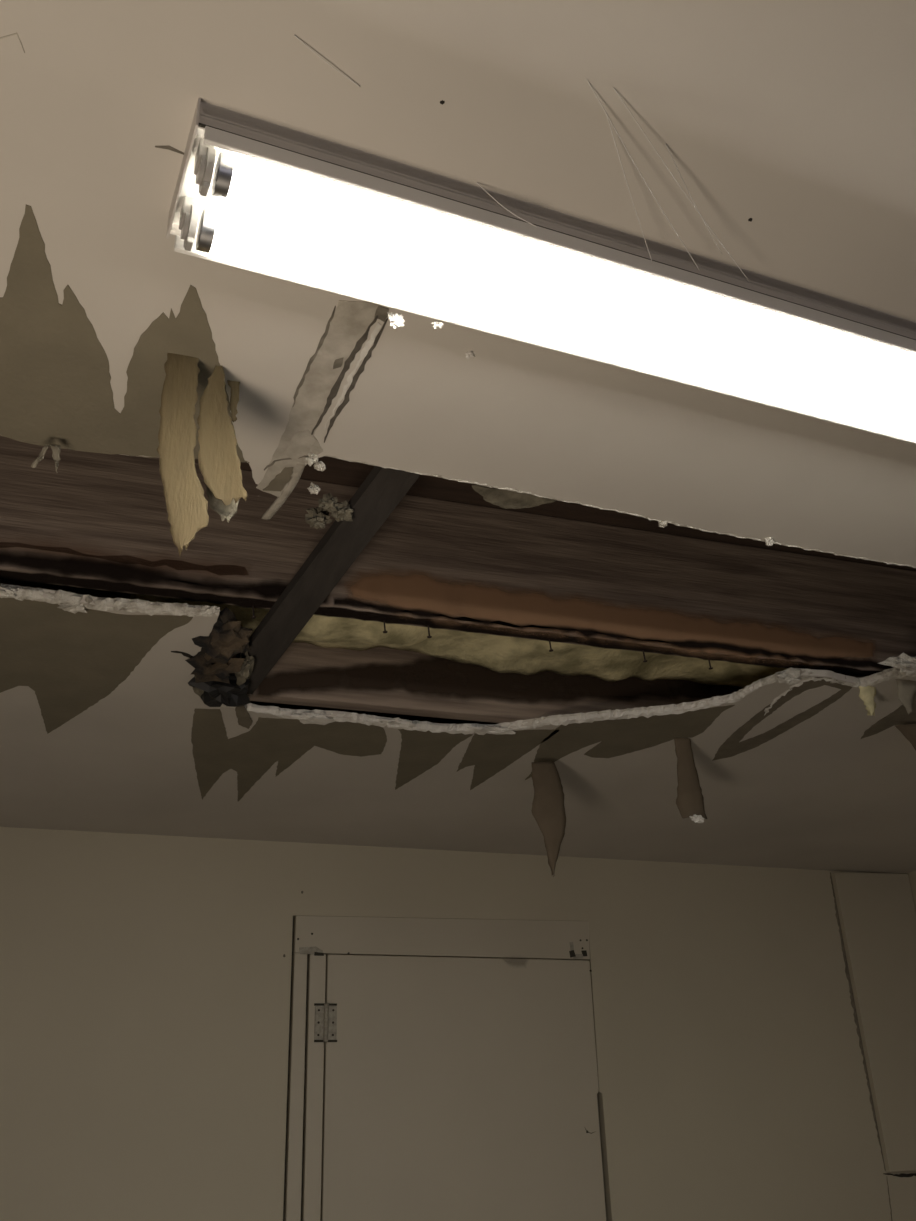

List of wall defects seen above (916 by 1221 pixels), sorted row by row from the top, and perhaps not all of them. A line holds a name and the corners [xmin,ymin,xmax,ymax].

peeling [325,306,389,428]
spalling [326,455,916,568]
spalling [0,584,220,617]
spalling [247,667,911,735]
crack [830,872,916,1221]